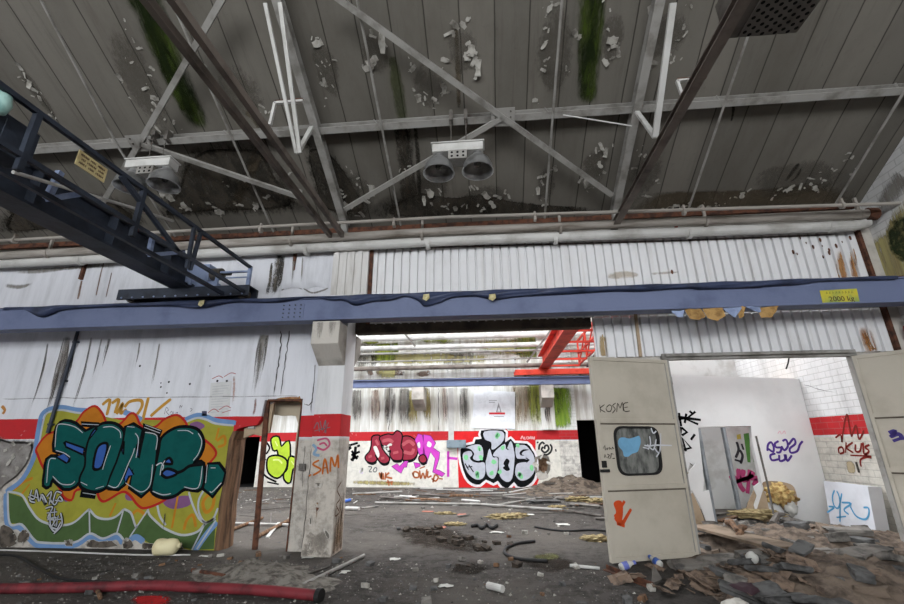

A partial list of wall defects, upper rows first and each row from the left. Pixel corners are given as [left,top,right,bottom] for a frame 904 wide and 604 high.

damp [144,22,193,111]
peeling [362,29,388,72]
peeling [463,40,482,80]
peeling [540,1,560,72]
peeling [602,28,621,67]
damp [158,112,297,220]
damp [306,128,586,218]
peeling [770,152,856,201]
corrosion [396,234,858,278]
damp [35,338,74,395]
damp [254,335,268,376]
damp [399,388,431,422]